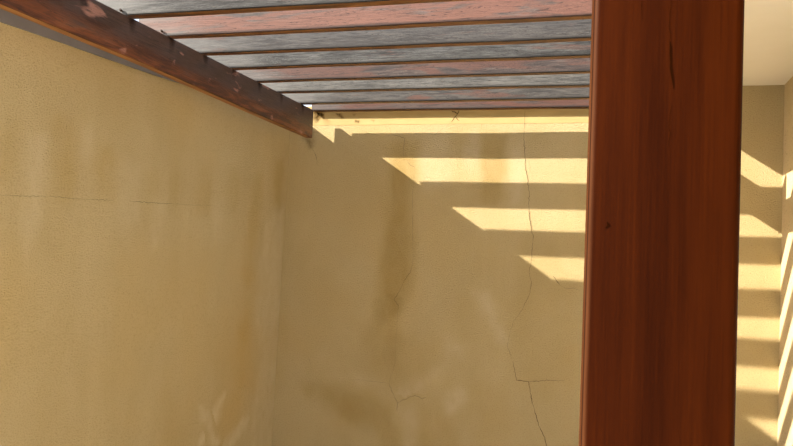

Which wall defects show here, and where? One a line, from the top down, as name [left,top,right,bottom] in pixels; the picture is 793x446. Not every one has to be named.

water stain [321,327,481,446]
crack [507,268,560,446]